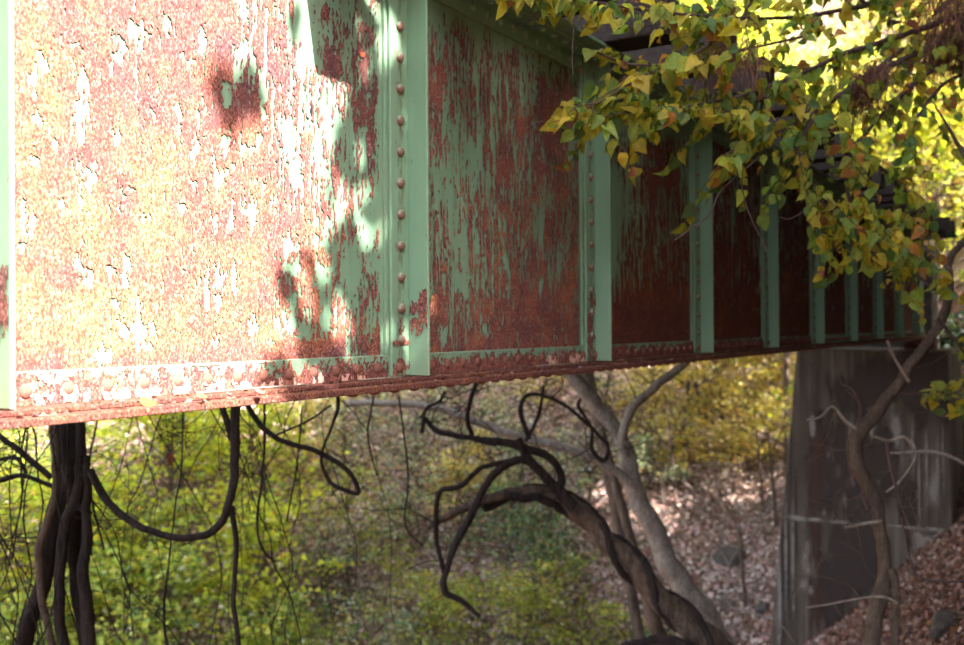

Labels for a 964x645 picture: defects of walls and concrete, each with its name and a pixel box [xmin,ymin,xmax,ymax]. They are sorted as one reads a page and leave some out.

corrosion [0,0,596,407]
corrosion [611,122,694,360]
corrosion [713,161,763,352]
corrosion [778,176,811,346]
corrosion [824,199,845,335]
corrosion [857,218,912,333]
peeling [29,372,161,405]
peeling [173,363,220,394]
peeling [204,377,300,391]